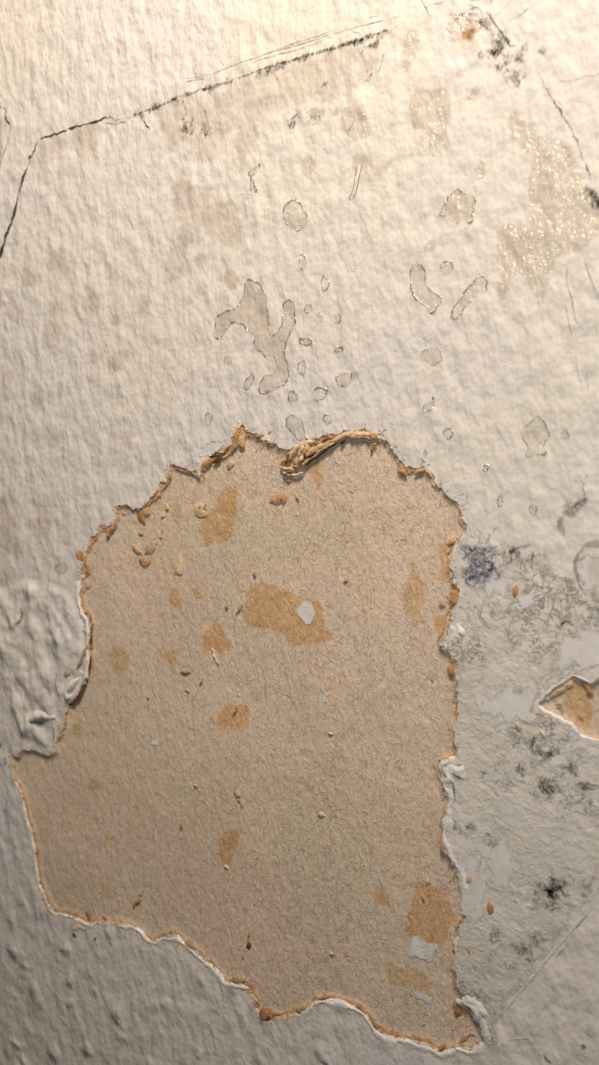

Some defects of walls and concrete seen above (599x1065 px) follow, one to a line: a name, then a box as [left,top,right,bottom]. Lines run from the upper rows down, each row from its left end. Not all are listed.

crack [0,70,114,258]
peeling [199,441,222,457]
damp [539,876,569,907]